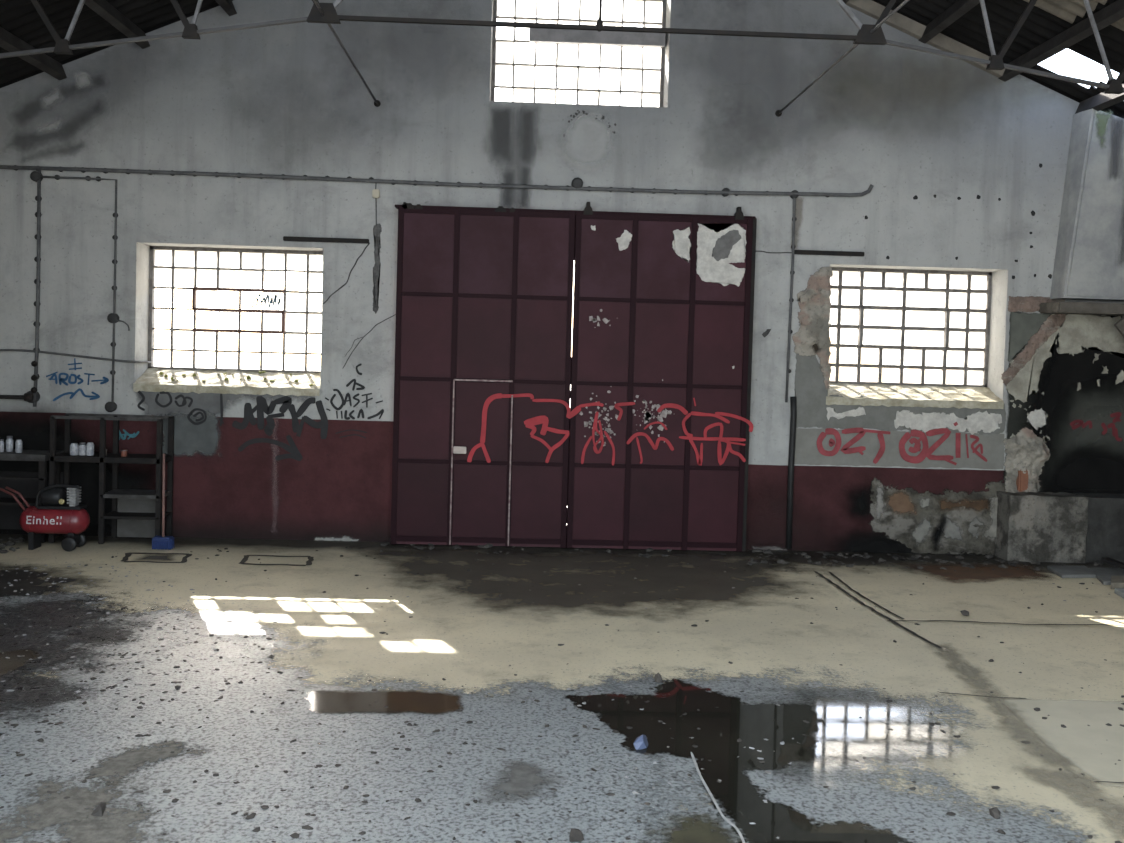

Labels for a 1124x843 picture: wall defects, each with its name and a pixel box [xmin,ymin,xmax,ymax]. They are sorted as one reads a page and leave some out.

water stain [1096,112,1123,178]
peeling [616,230,632,251]
peeling [672,223,747,287]
spalling [792,267,833,390]
spalling [869,296,1124,555]